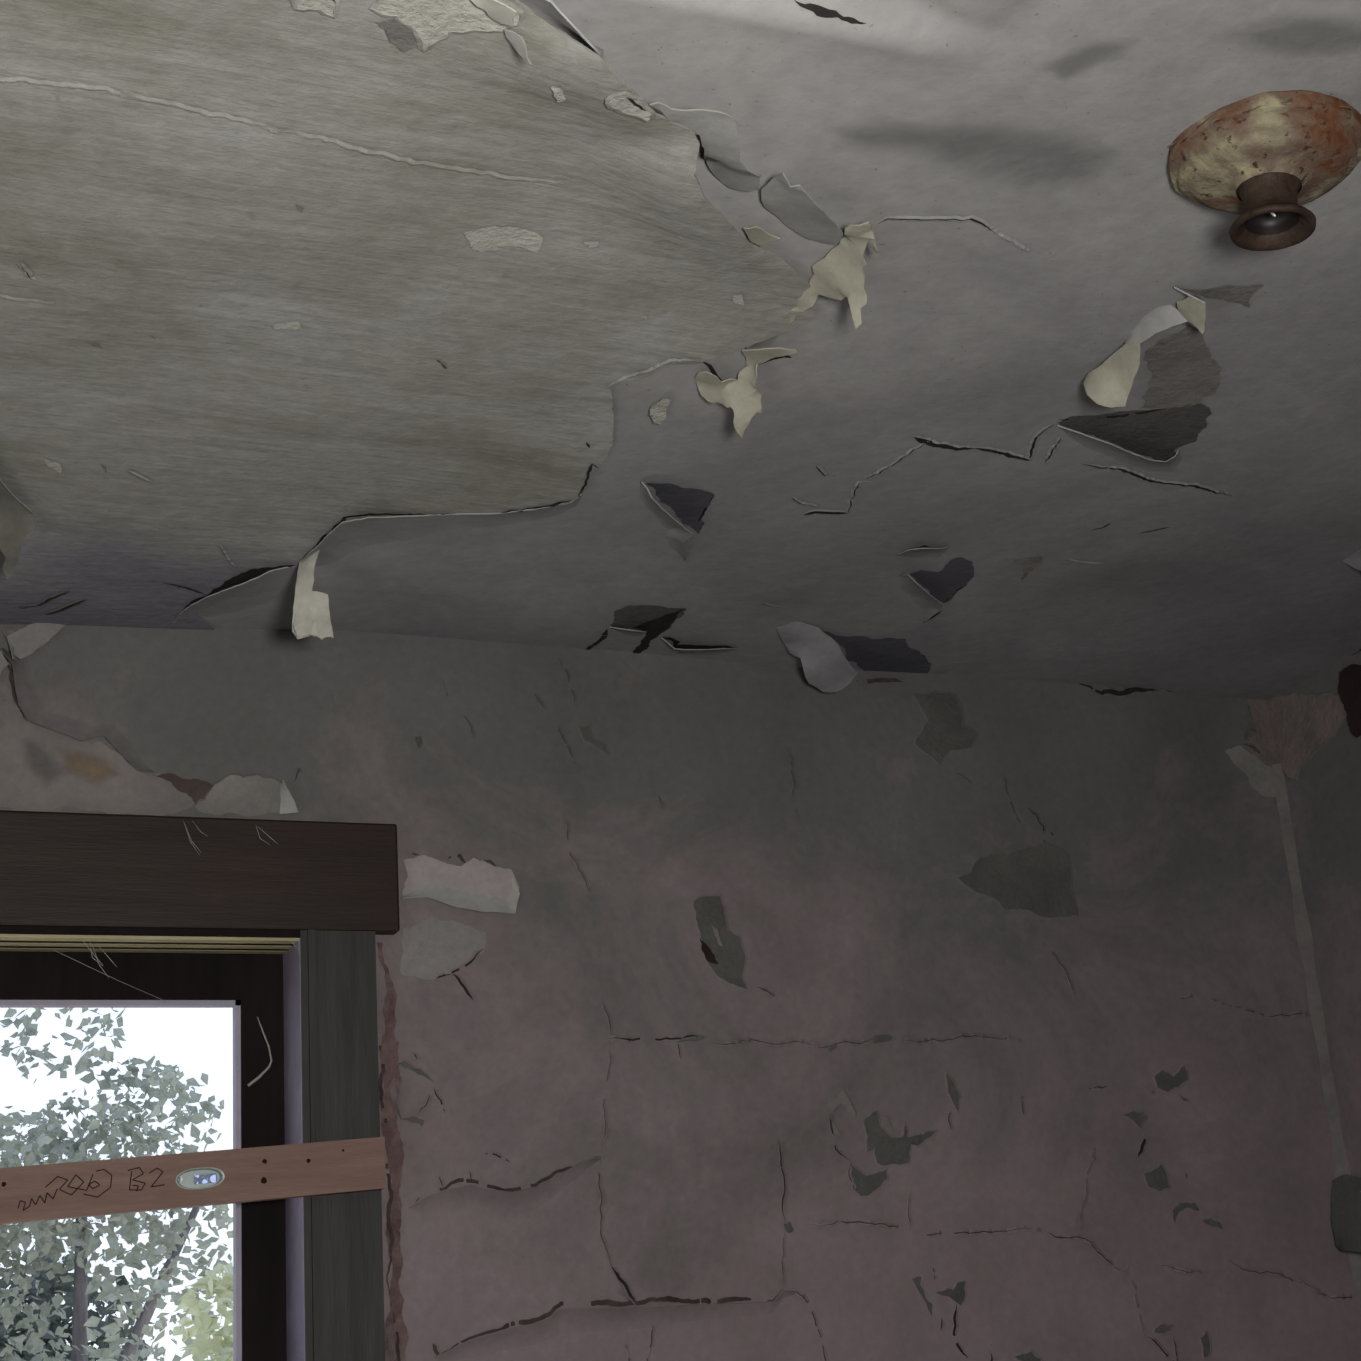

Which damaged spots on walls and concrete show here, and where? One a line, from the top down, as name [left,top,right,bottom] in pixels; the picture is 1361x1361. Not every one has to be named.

spalling [369,0,605,65]
crack [0,76,565,185]
peeling [604,91,879,439]
peeling [163,464,599,640]
peeling [639,481,714,560]
crack [790,422,1234,516]
peeling [1057,285,1263,472]
peeling [0,590,302,819]
spalling [691,893,775,998]
spalling [377,853,600,1361]
crack [596,1000,1022,1306]
crack [775,1131,1353,1361]